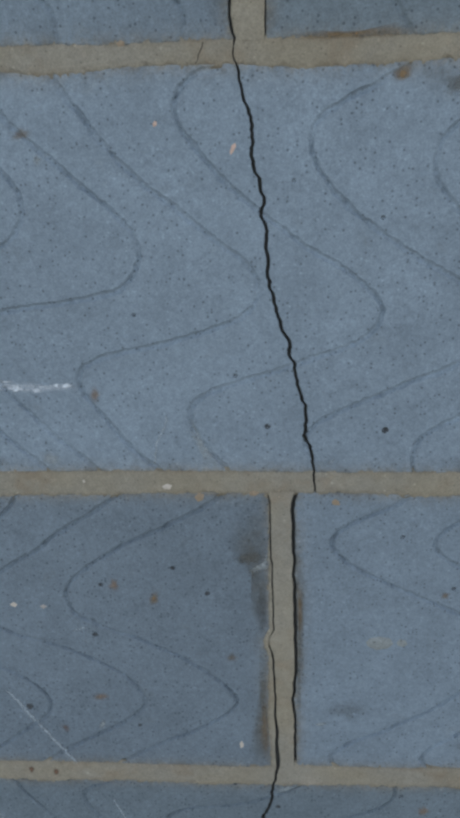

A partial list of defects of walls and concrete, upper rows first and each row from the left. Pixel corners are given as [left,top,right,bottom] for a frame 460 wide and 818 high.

crack [228,0,316,818]